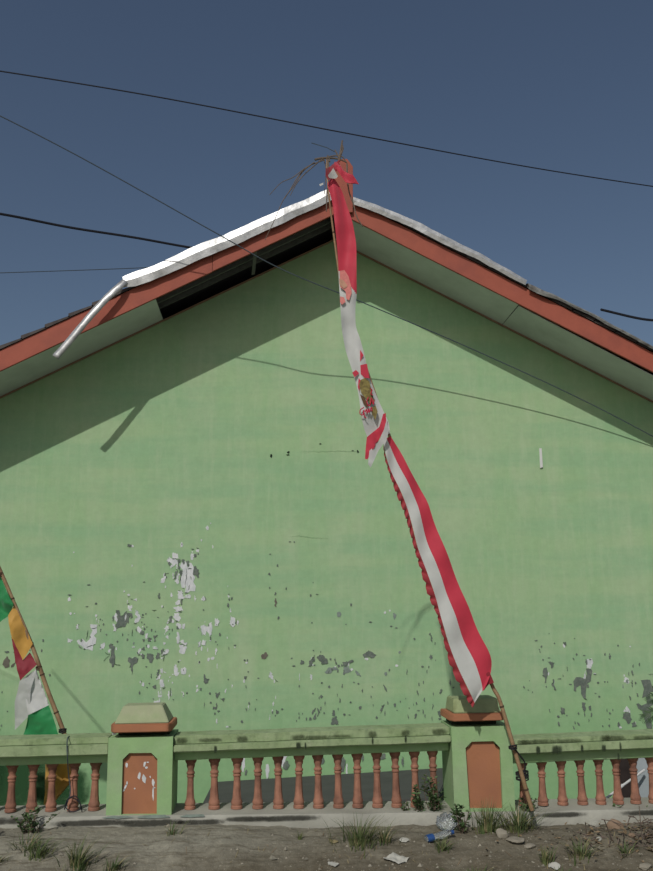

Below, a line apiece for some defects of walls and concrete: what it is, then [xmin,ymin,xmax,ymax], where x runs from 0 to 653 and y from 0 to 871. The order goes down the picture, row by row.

peeling [67,539,239,728]
peeling [291,650,463,725]
peeling [535,640,608,730]
peeling [602,663,653,728]
peeling [123,762,155,799]